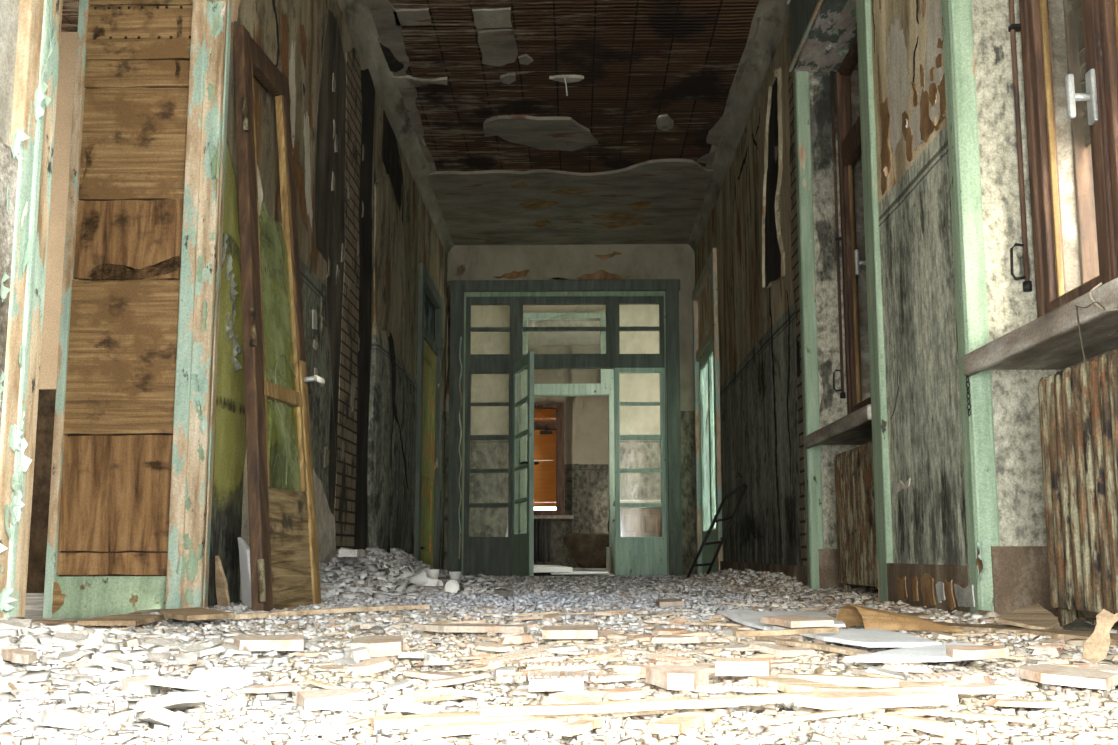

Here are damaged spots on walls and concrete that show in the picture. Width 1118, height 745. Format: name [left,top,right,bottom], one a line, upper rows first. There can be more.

flaking render [0,0,30,161]
peeling [33,0,58,121]
peeling [880,0,946,195]
peeling [0,183,33,302]
flaking render [762,67,807,566]
water stain [887,215,906,335]
peeling [0,411,32,553]
water stain [898,491,922,551]
water stain [941,473,949,535]
peeling [0,568,17,612]